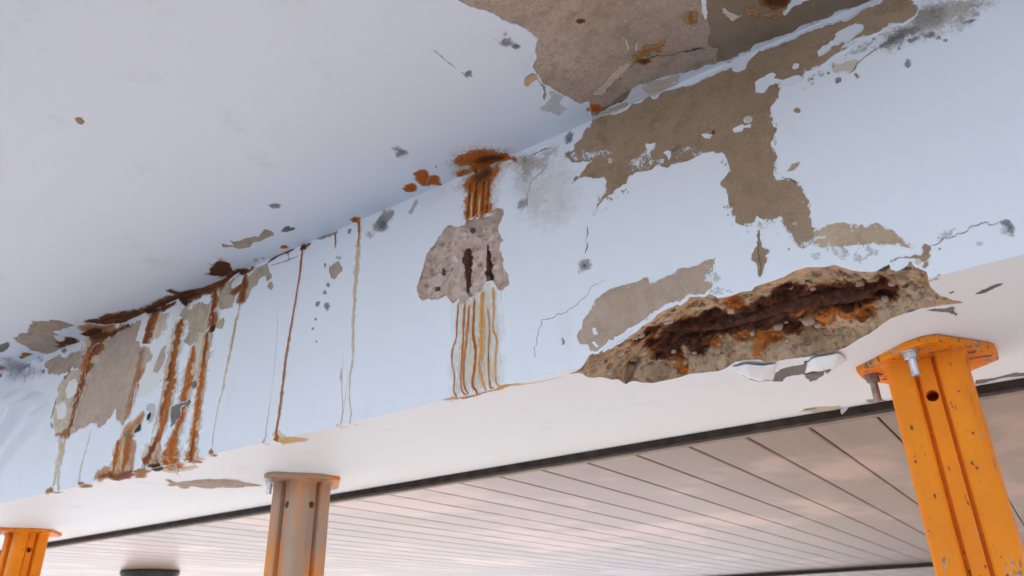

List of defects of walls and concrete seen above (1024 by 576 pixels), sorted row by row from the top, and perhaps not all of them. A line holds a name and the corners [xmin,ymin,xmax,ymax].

rust [403,166,442,192]
rust [454,149,518,222]
peeling [455,0,963,384]
peeling [0,319,197,441]
rust [45,230,338,494]
peeling [179,262,275,347]
rust [336,217,361,428]
spalling [417,208,510,305]
rust [446,287,532,401]
peeling [973,280,1007,295]